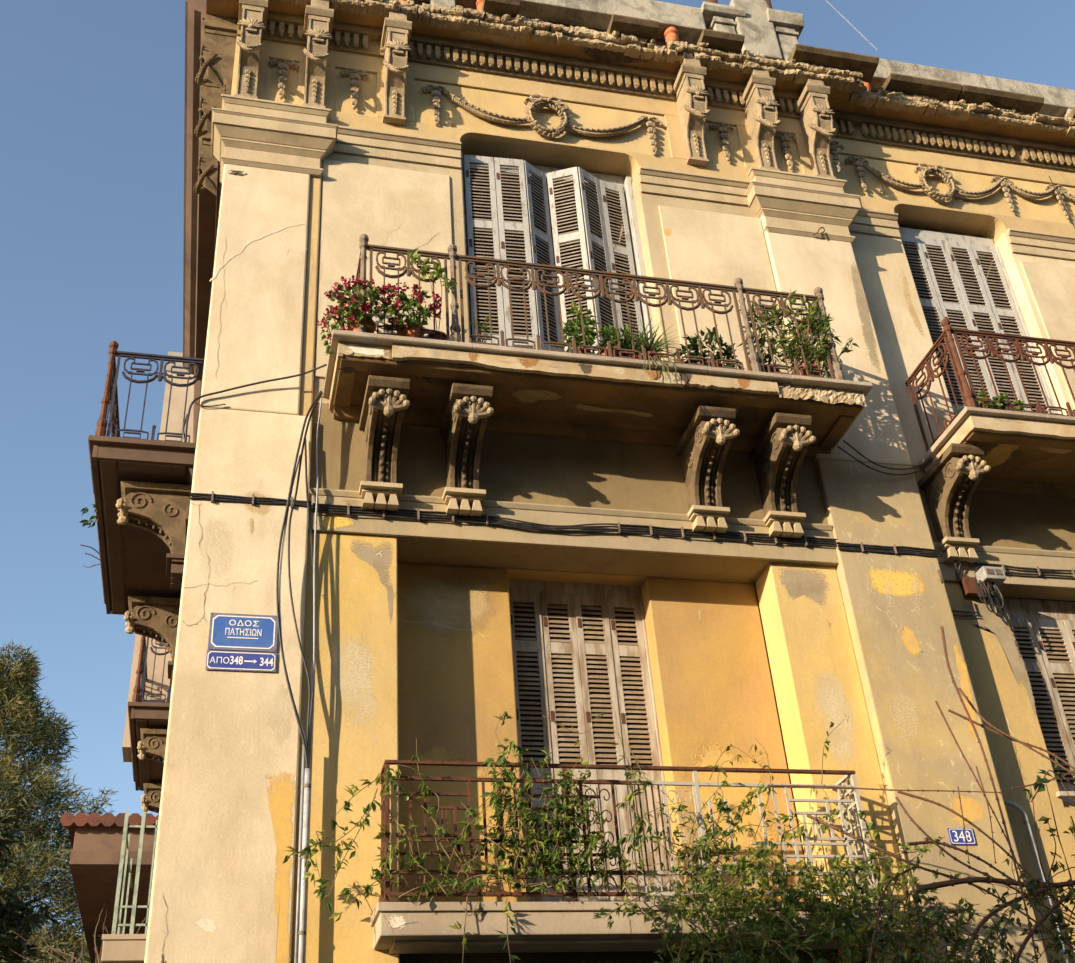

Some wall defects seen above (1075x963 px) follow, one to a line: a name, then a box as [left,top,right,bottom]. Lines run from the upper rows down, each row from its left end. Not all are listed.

flaking render [328,0,1075,138]
crack [209,224,314,371]
crack [182,503,252,626]